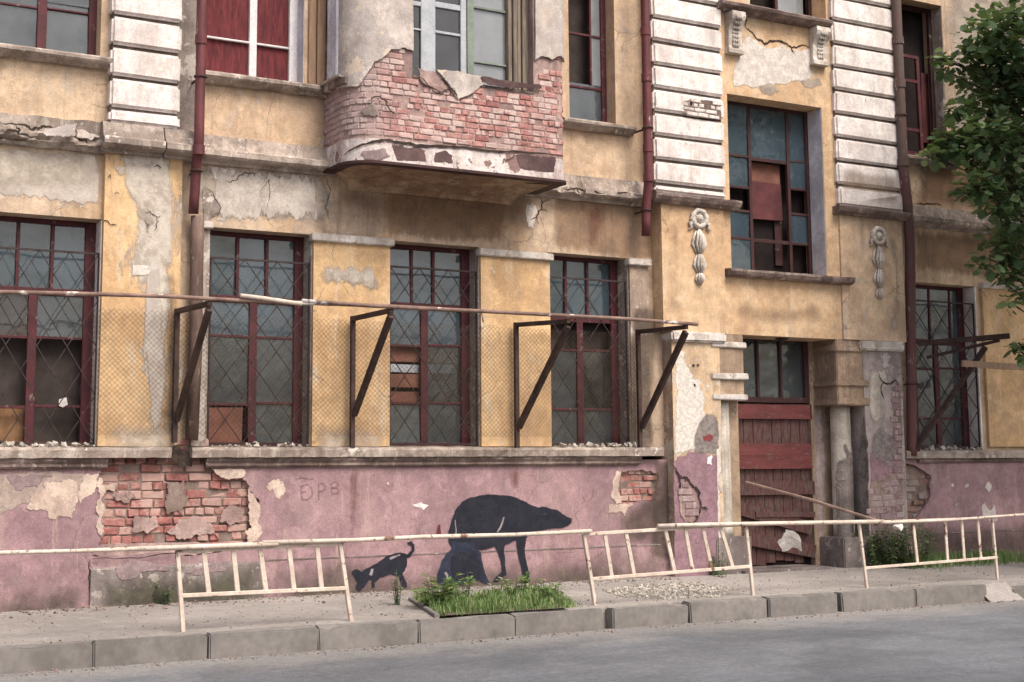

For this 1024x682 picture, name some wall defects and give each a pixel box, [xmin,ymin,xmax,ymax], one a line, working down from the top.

crack [745,19,809,53]
peeling [733,35,822,95]
flaking render [682,98,722,120]
crack [0,122,88,143]
peeling [361,144,453,163]
peeling [516,154,556,172]
crack [526,183,640,223]
peeling [322,266,378,289]
flaking render [0,155,330,580]
peeling [674,351,721,577]
flaking render [867,369,930,541]
flaking render [608,470,657,516]